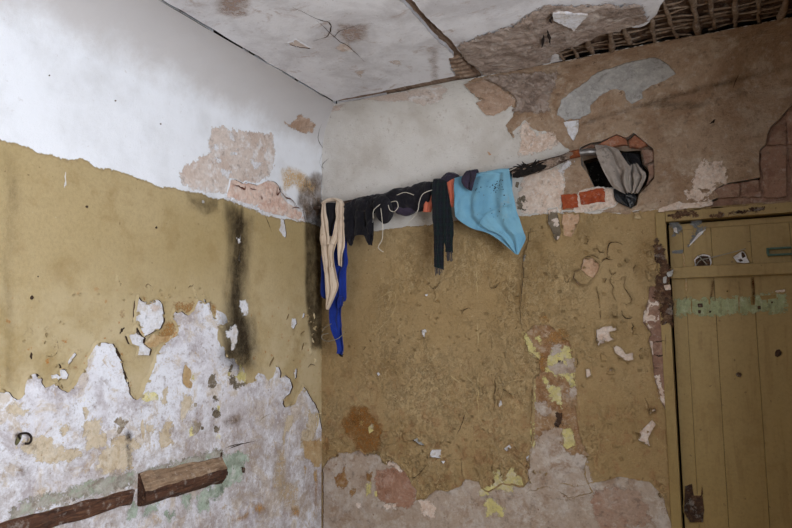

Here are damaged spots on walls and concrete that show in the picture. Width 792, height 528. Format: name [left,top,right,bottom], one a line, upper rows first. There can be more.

crack [297,9,361,56]
peeling [179,125,306,239]
spalling [457,3,792,288]
damp [240,322,249,351]
peeling [0,270,789,528]
crack [583,236,663,368]